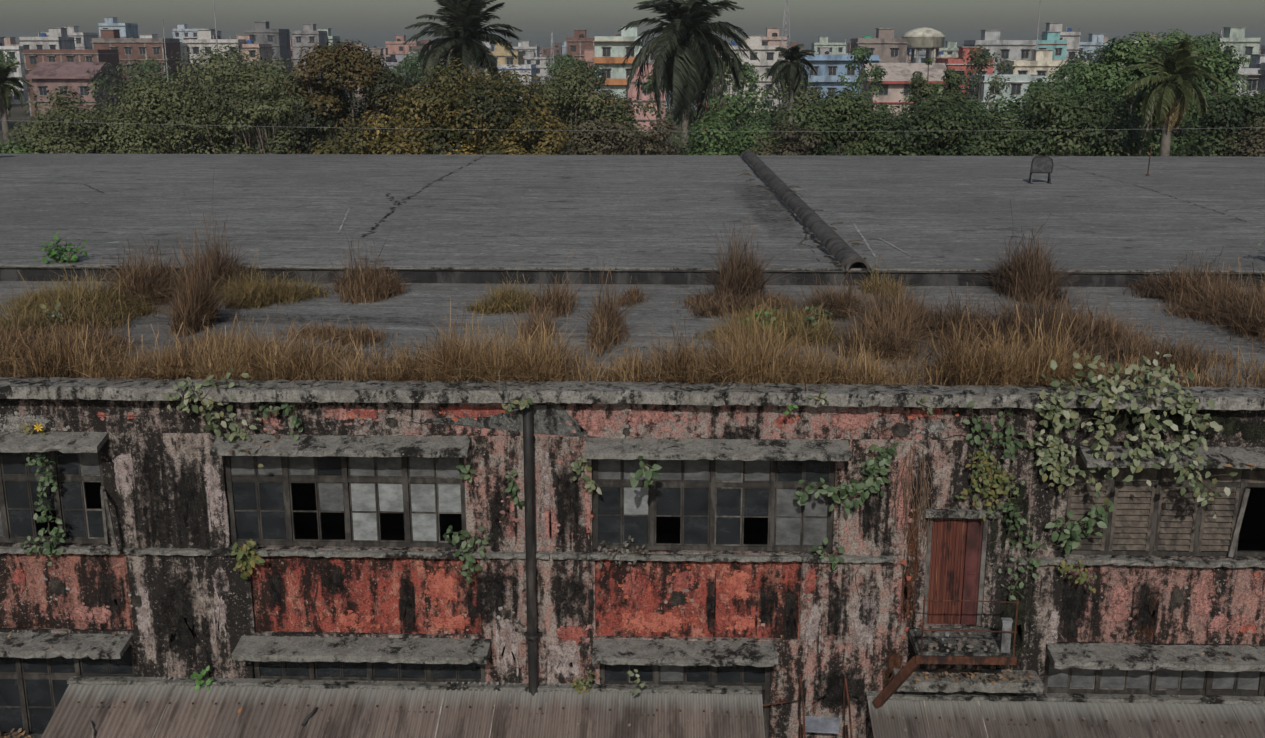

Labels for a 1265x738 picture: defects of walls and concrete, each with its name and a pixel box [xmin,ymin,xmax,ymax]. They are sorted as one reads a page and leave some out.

crack [362,156,483,237]
peeling [566,407,684,439]
damp [94,449,230,677]
peeling [43,573,111,625]
peeling [319,610,399,632]
peeling [421,563,474,634]
peeling [552,566,701,646]
peeling [716,570,765,634]
damp [755,570,874,658]
peeling [1110,584,1133,634]
peeling [1166,573,1259,636]
damp [800,671,866,712]